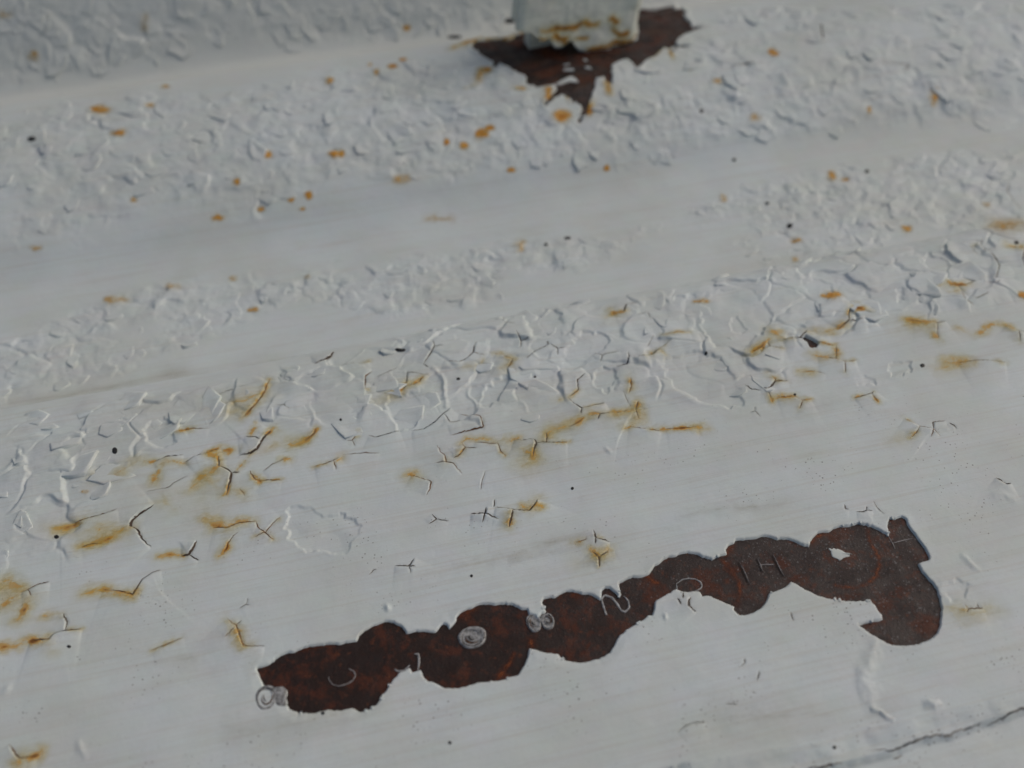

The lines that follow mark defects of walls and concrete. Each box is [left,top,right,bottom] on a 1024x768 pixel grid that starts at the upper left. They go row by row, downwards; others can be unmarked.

peeling [472,5,702,127]
corrosion [554,98,571,122]
corrosion [444,125,494,149]
crack [754,309,863,373]
corrosion [905,317,939,338]
crack [316,306,697,527]
crack [77,381,289,547]
corrosion [197,447,233,480]
crack [183,517,280,560]
crack [578,531,610,566]
peeling [257,517,976,715]
corrosion [0,636,41,651]